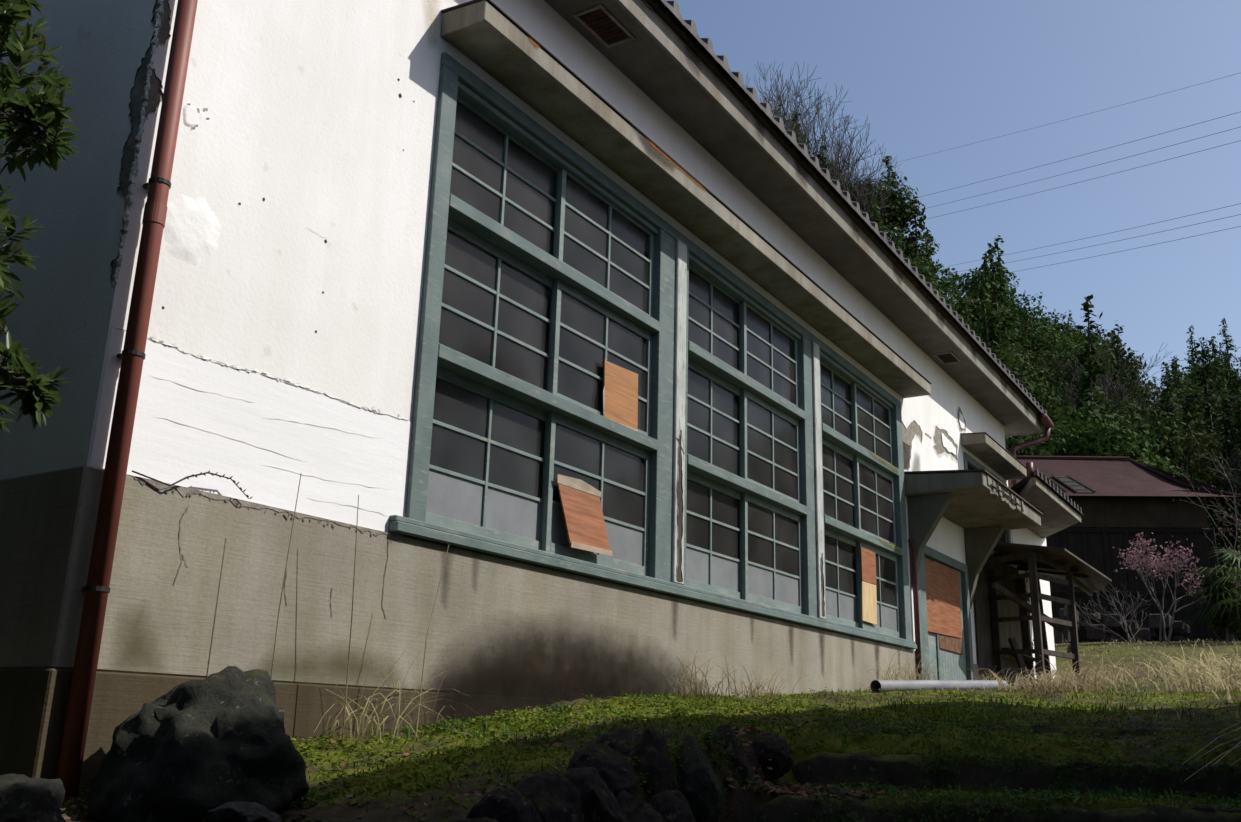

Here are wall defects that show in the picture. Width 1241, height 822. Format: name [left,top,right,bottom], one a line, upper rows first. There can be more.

spalling [109,0,173,288]
crack [114,327,411,619]
spalling [902,405,966,471]